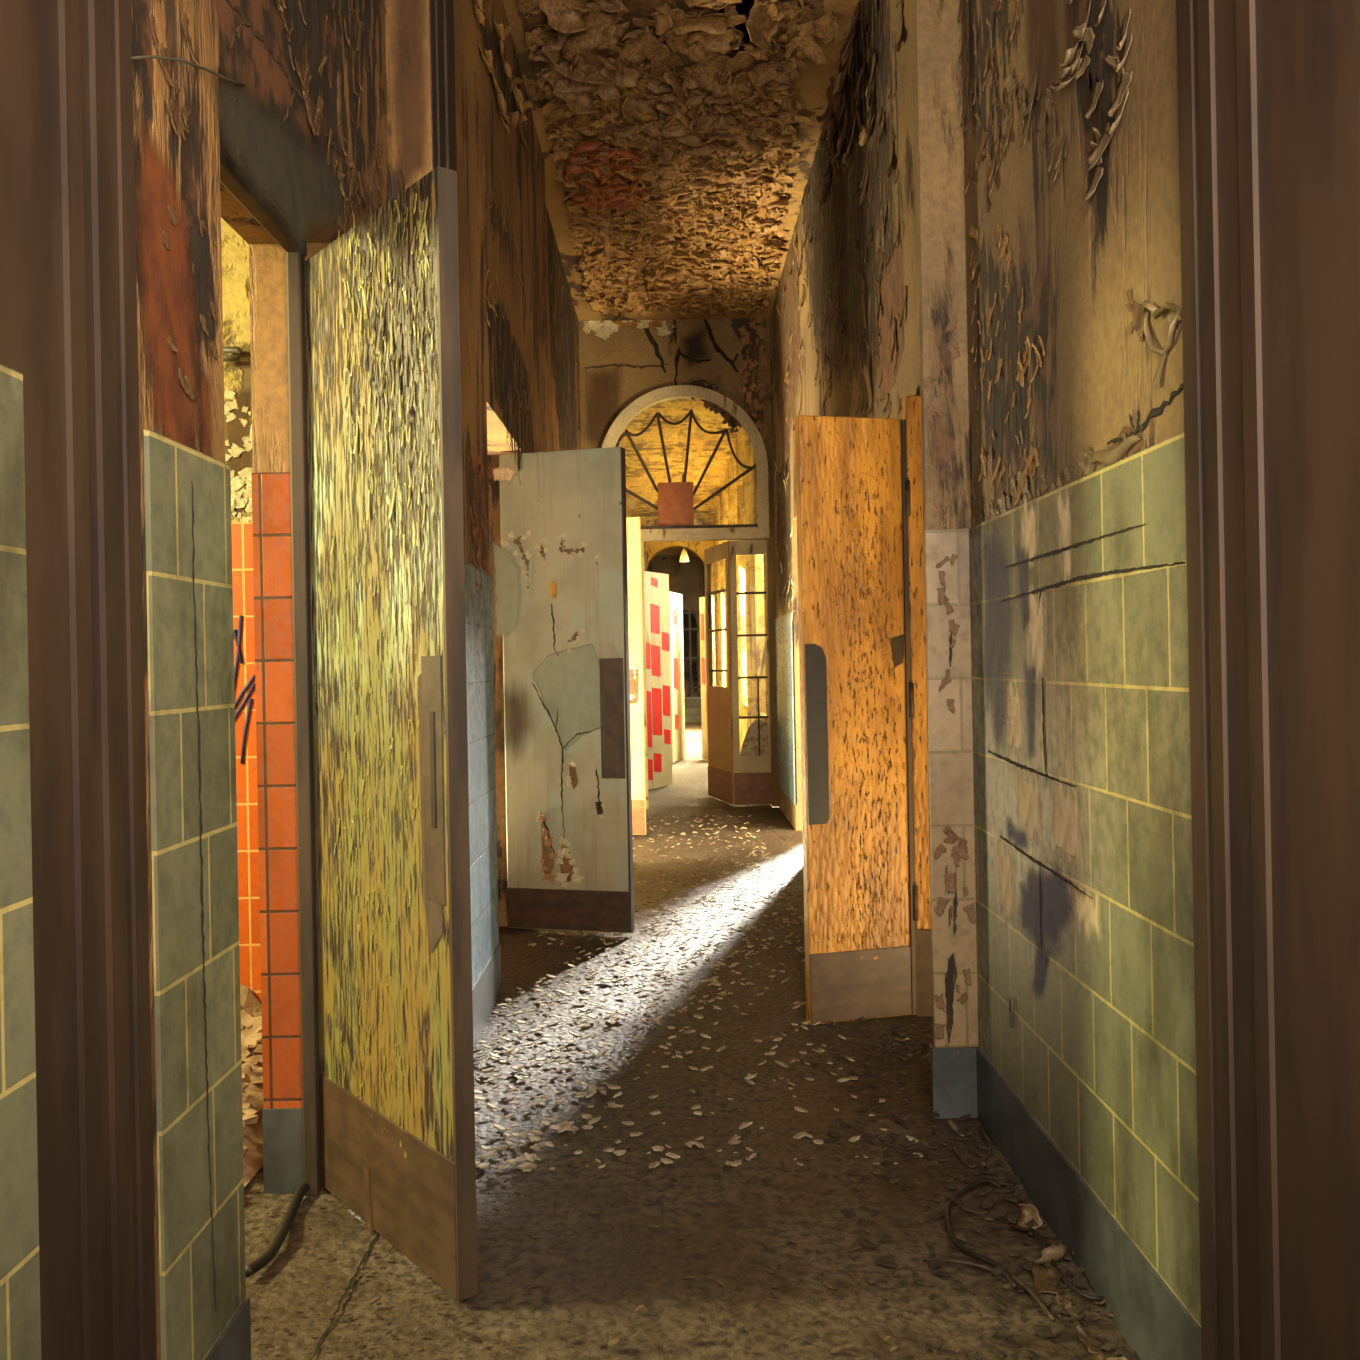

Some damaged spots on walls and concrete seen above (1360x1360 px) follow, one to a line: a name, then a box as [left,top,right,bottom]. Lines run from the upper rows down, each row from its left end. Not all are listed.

peeling [922,0,1133,529]
peeling [469,0,907,623]
peeling [1125,288,1148,342]
crack [585,319,749,385]
flaking render [1078,409,1146,477]
crack [1002,524,1186,615]
peeling [566,761,578,789]
water stain [1007,822,1026,846]
water stain [1033,948,1048,994]